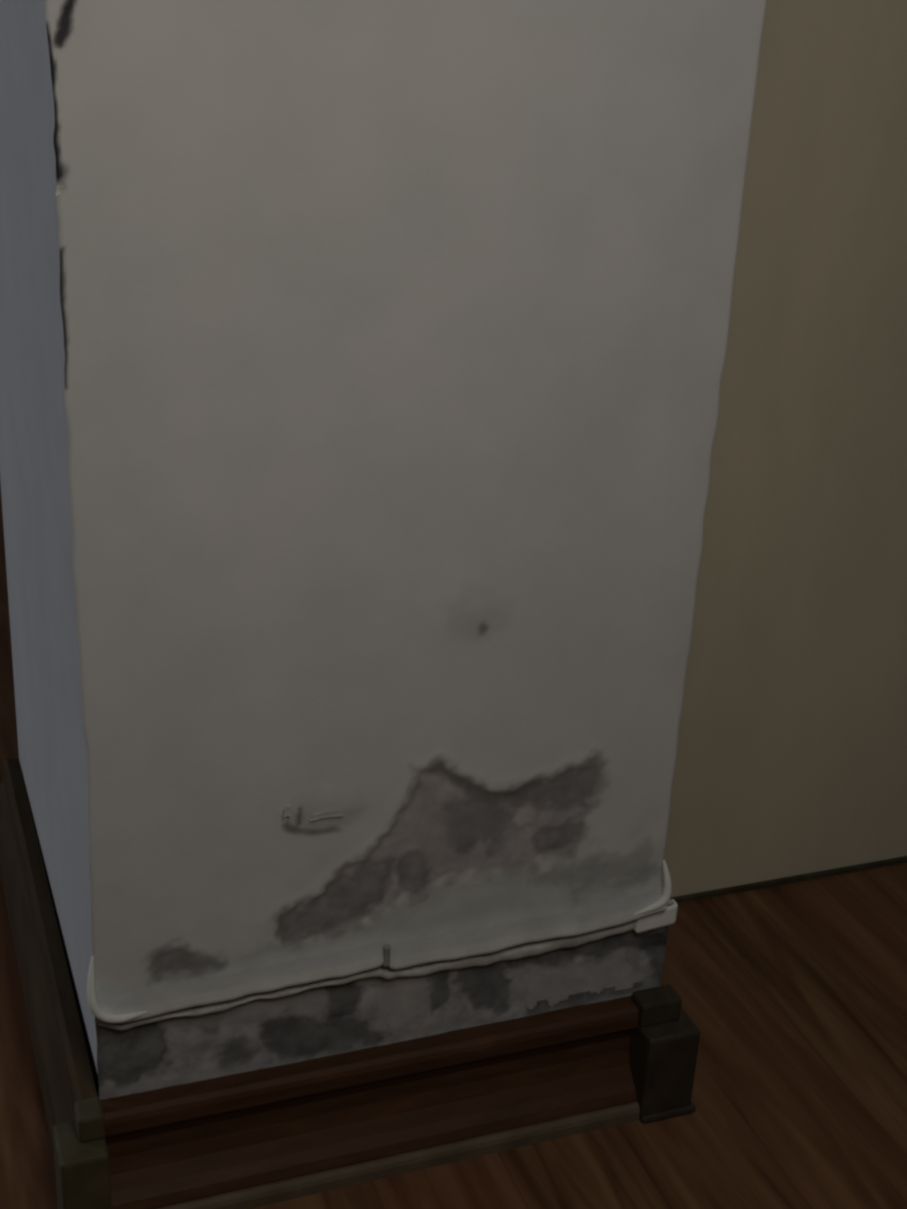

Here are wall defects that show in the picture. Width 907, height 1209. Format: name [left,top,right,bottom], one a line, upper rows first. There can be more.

spalling [87,859,678,1100]
leakage [105,868,661,993]